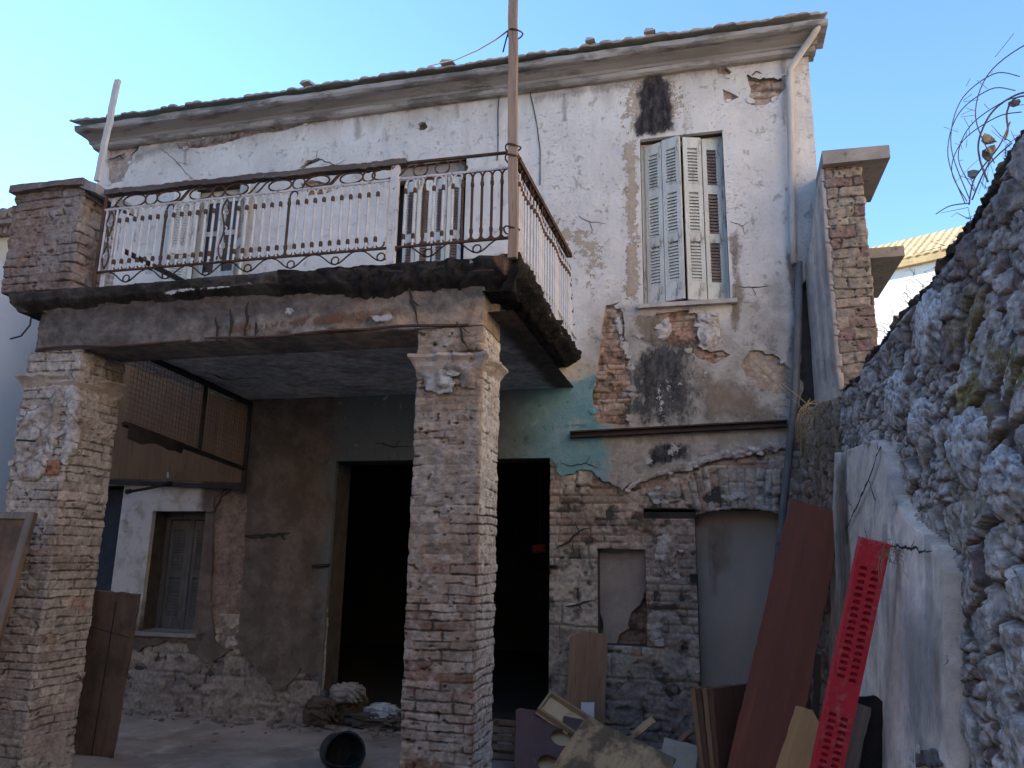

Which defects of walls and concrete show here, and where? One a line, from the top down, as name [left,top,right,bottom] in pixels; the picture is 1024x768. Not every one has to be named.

spalling [717,70,786,105]
crack [109,146,193,179]
spalling [656,309,729,363]
water stain [614,315,777,465]
crack [843,446,881,560]
crack [556,522,591,552]
crack [892,540,932,561]
flaking render [122,483,329,722]
flaking render [548,414,810,749]